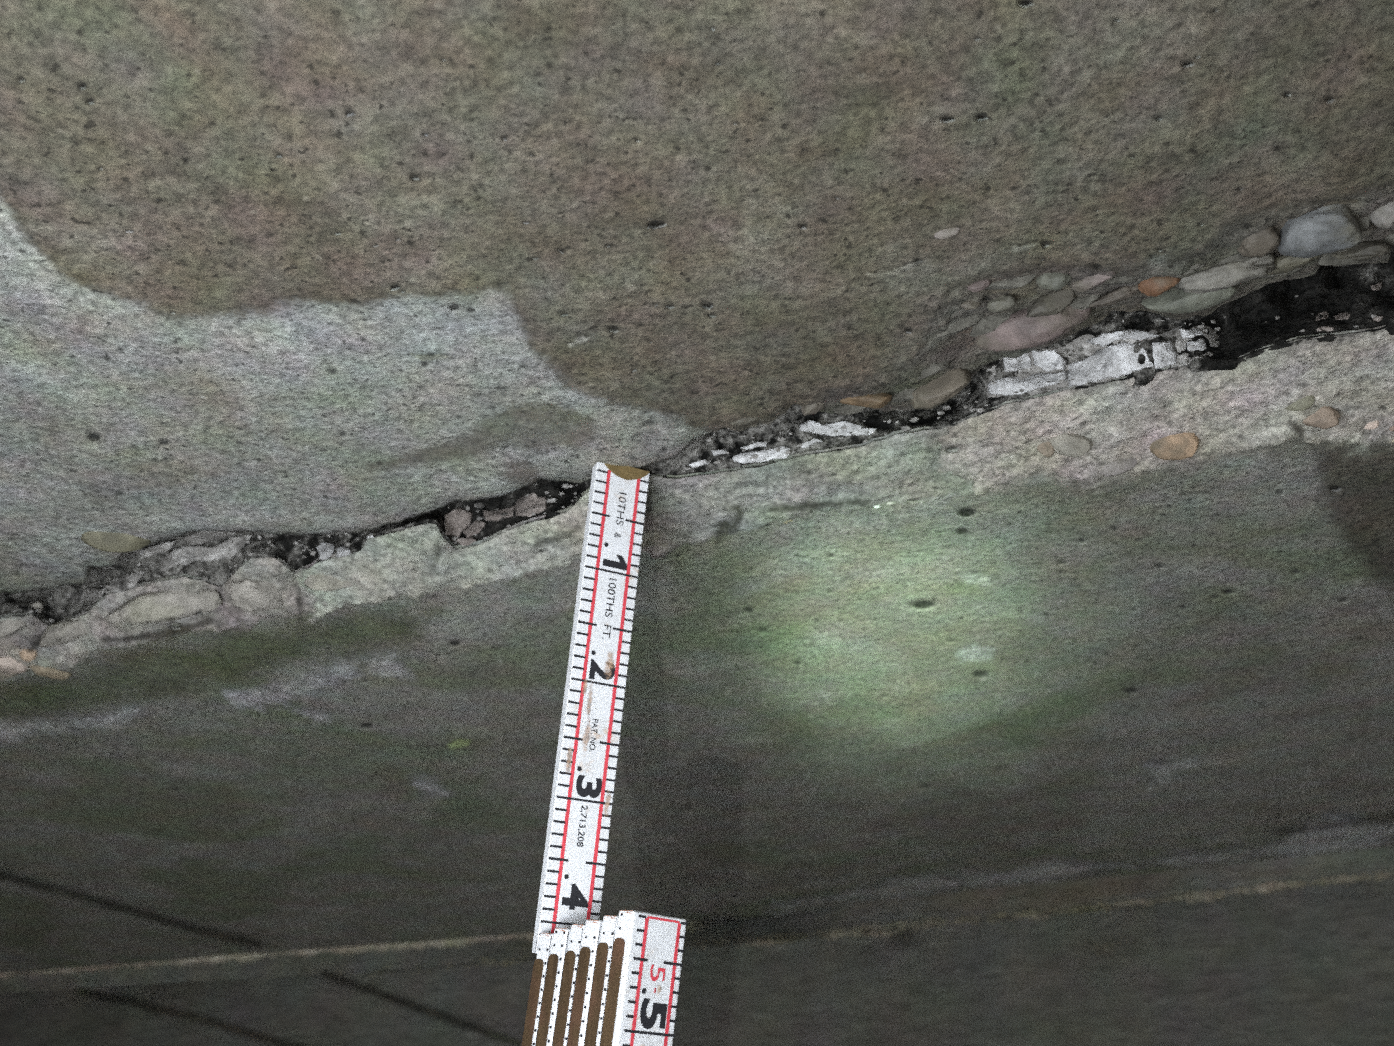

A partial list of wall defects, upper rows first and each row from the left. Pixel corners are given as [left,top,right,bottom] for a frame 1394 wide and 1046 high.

crack [0,479,591,651]
crack [716,507,739,538]
crack [781,501,855,510]
crack [640,245,1394,478]
spalling [641,328,1394,559]
spalling [731,185,1394,431]
water stain [1322,441,1394,581]